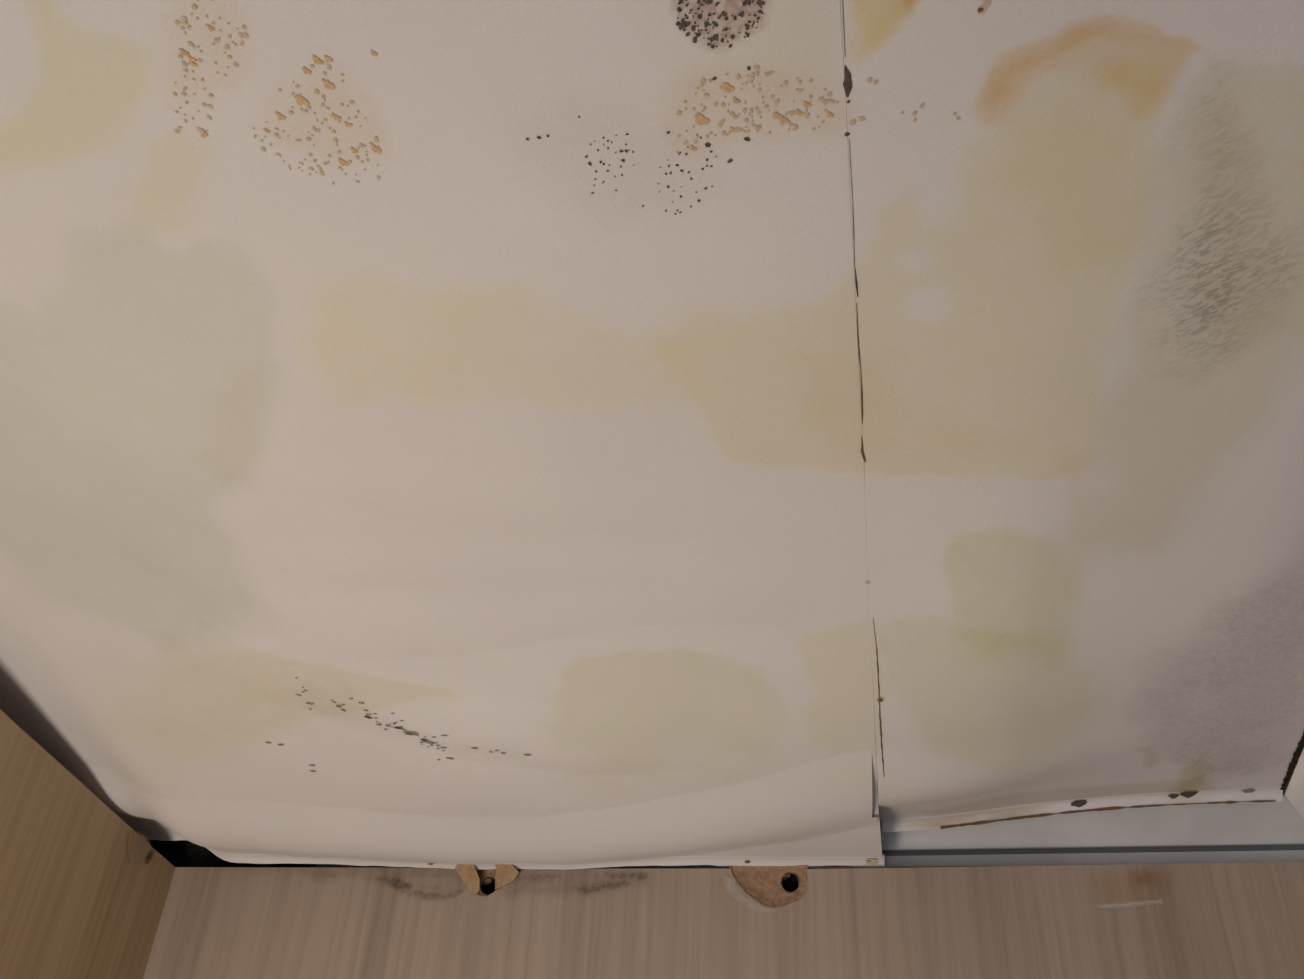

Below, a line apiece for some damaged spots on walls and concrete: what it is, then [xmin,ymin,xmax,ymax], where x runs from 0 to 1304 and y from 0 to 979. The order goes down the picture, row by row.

rust [172,0,248,138]
rust [252,55,381,185]
damp [676,0,765,49]
rust [667,65,839,151]
damp [842,0,878,103]
damp [844,117,865,297]
damp [331,698,453,761]
peeling [882,787,1283,832]